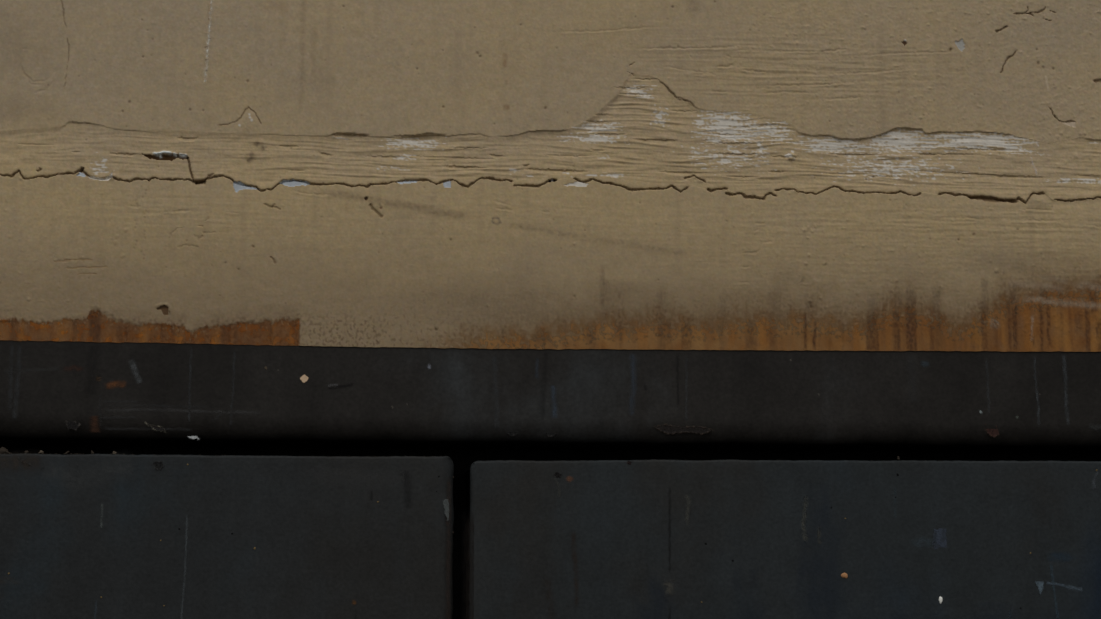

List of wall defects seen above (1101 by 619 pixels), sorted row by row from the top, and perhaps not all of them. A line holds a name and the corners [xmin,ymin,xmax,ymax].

peeling [0,73,1101,219]
crack [0,158,1101,205]
corrosion [462,285,1101,352]